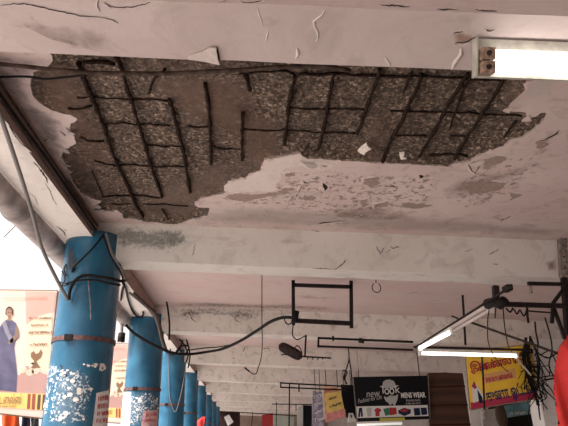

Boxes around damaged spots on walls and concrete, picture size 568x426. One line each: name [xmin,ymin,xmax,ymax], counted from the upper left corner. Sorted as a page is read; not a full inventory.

crack [1,0,150,24]
rust [181,85,269,162]
spalling [31,47,551,224]
water stain [118,229,184,246]
peeling [43,366,93,423]